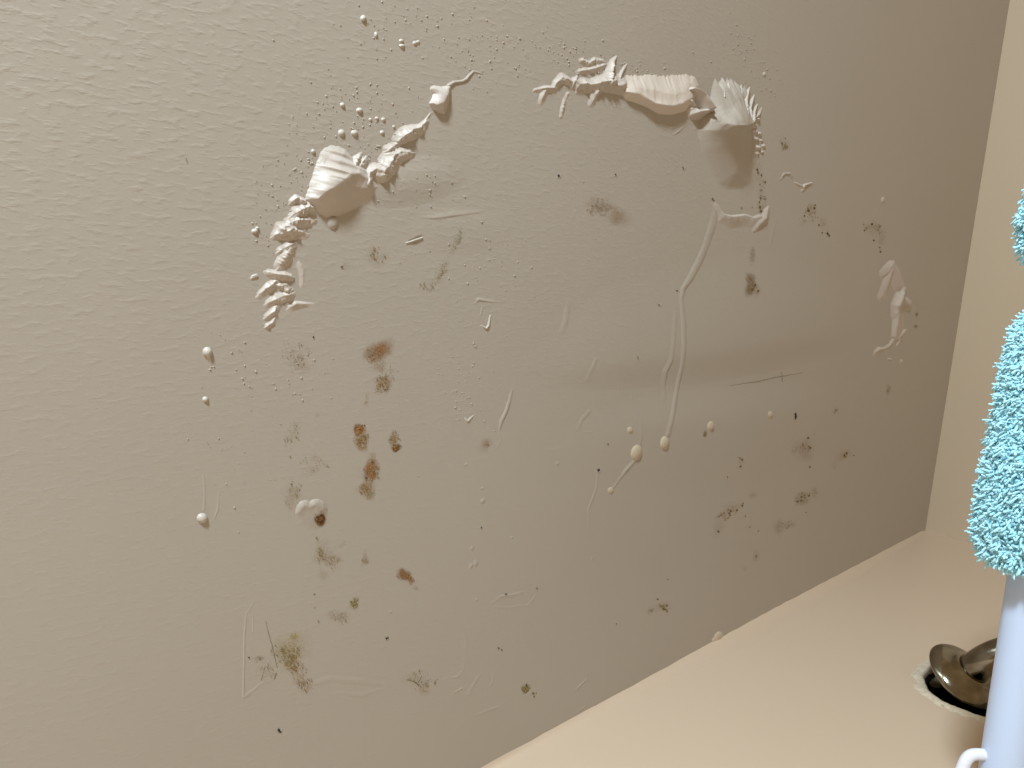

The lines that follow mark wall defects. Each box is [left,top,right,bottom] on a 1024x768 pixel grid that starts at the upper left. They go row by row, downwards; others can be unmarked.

peeling [712,198,771,233]
peeling [873,260,912,364]
rust [354,424,369,450]
rust [359,460,379,499]
water stain [258,635,312,693]